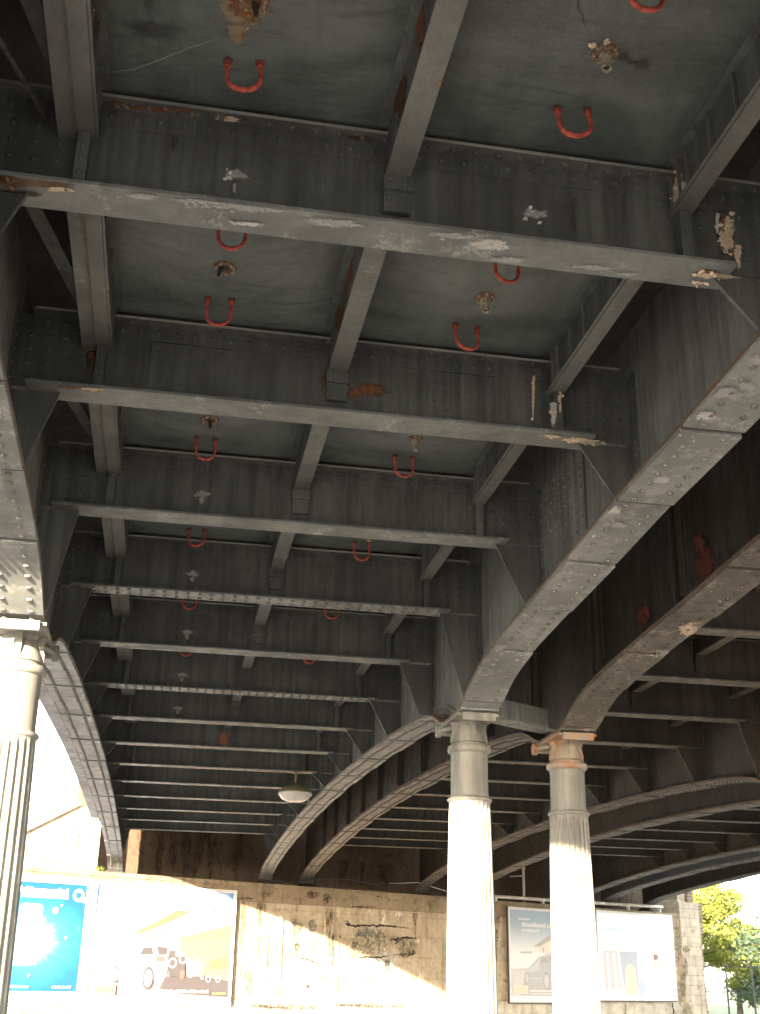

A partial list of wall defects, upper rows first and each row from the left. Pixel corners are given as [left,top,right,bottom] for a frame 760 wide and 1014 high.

corrosion [222,0,273,45]
peeling [691,212,742,288]
peeling [544,391,606,446]
leakage [239,902,279,994]
leakage [323,911,334,988]
crack [345,921,417,962]
leakage [368,910,417,936]